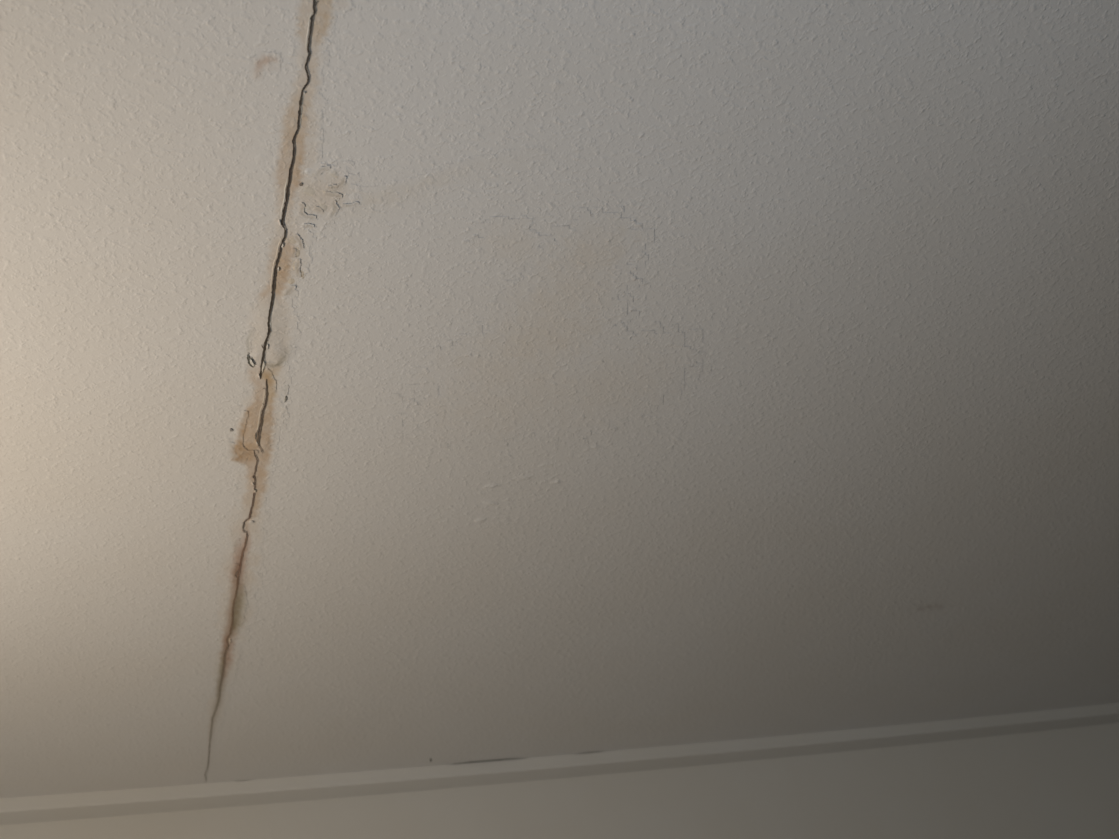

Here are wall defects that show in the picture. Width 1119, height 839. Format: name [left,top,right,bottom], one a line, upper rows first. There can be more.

crack [204,0,319,779]
damp [205,0,363,769]